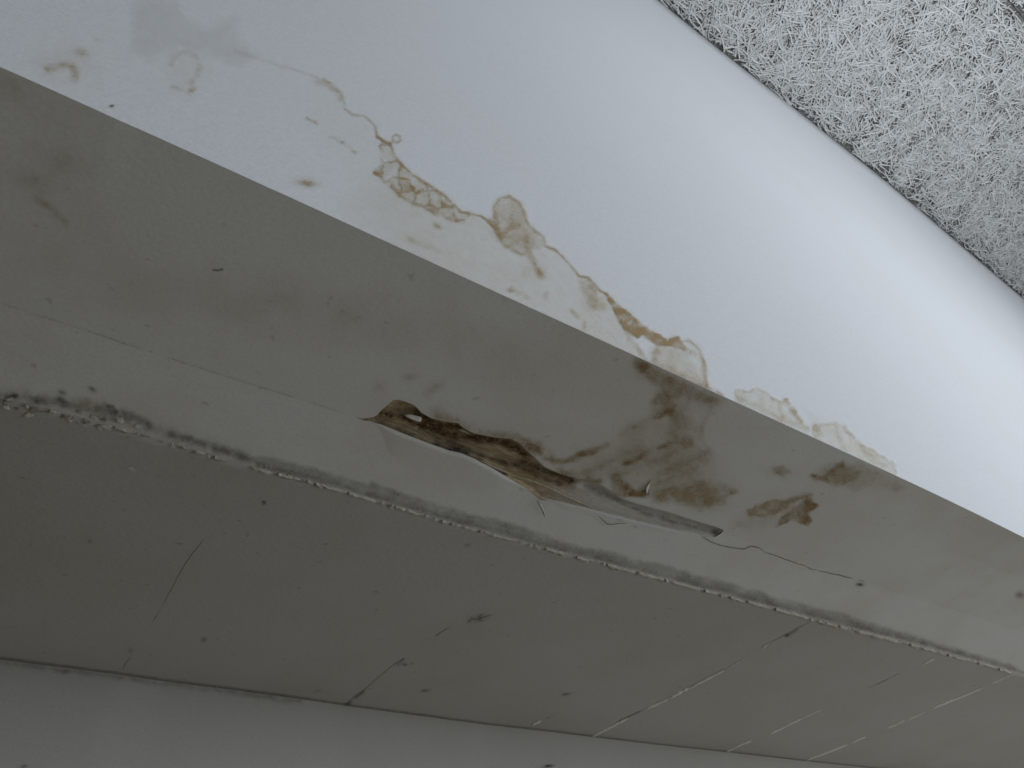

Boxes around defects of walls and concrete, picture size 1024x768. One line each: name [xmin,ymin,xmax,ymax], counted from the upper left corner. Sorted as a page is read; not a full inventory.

damp [374,159,529,253]
damp [577,273,686,350]
flaking render [357,400,723,537]
crack [703,537,865,582]